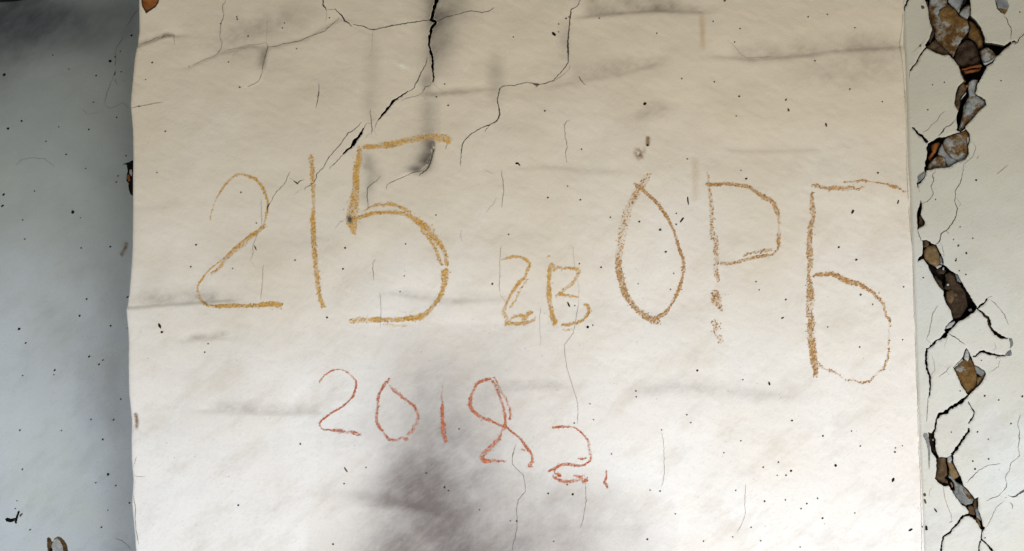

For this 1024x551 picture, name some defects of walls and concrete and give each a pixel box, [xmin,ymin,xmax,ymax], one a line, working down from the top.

crack [194,0,492,293]
crack [367,4,584,202]
crack [899,0,979,252]
flaking render [918,0,1010,182]
peeling [995,0,1020,15]
flaking render [917,201,976,332]
flaking render [923,423,986,538]
crack [913,277,1024,551]
flaking render [953,348,986,397]